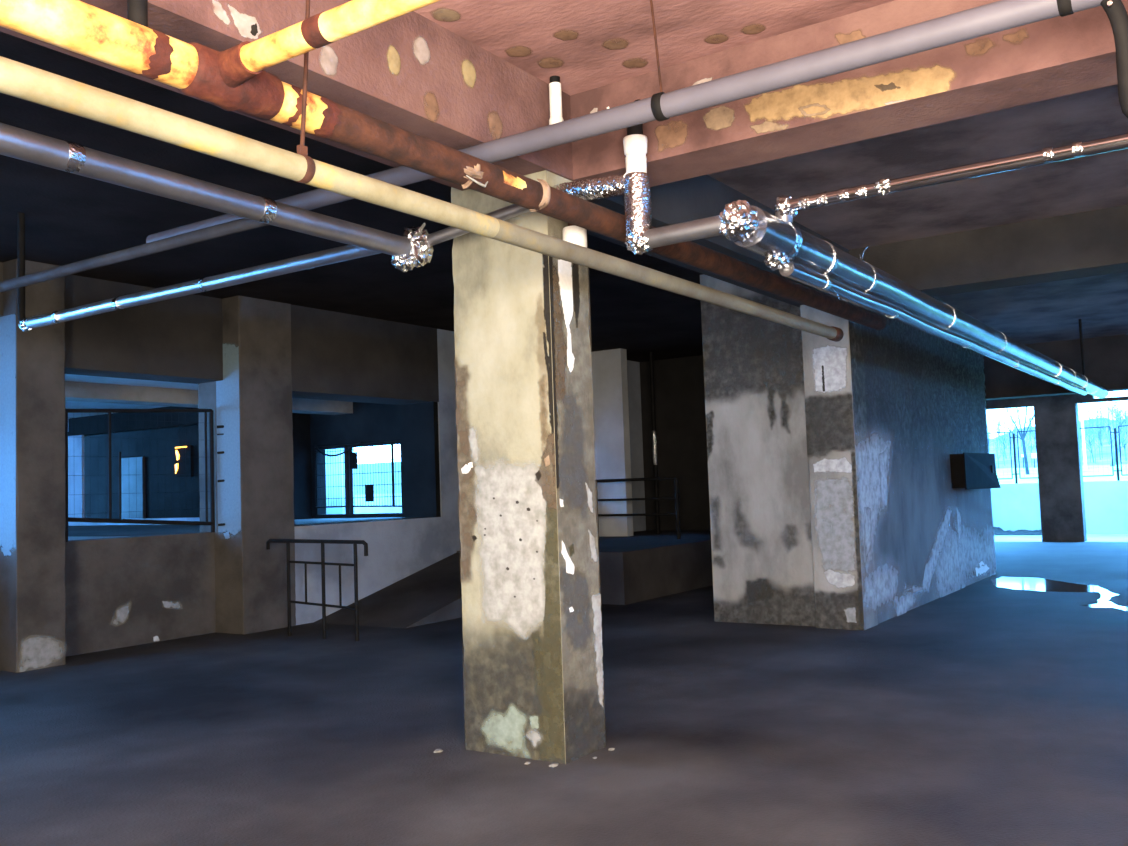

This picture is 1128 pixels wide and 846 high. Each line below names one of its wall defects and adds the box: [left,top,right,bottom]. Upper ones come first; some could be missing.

rust [132,26,174,80]
flaking render [703,65,954,134]
rust [280,84,627,243]
rust [650,241,887,330]
leakage [714,436,997,630]